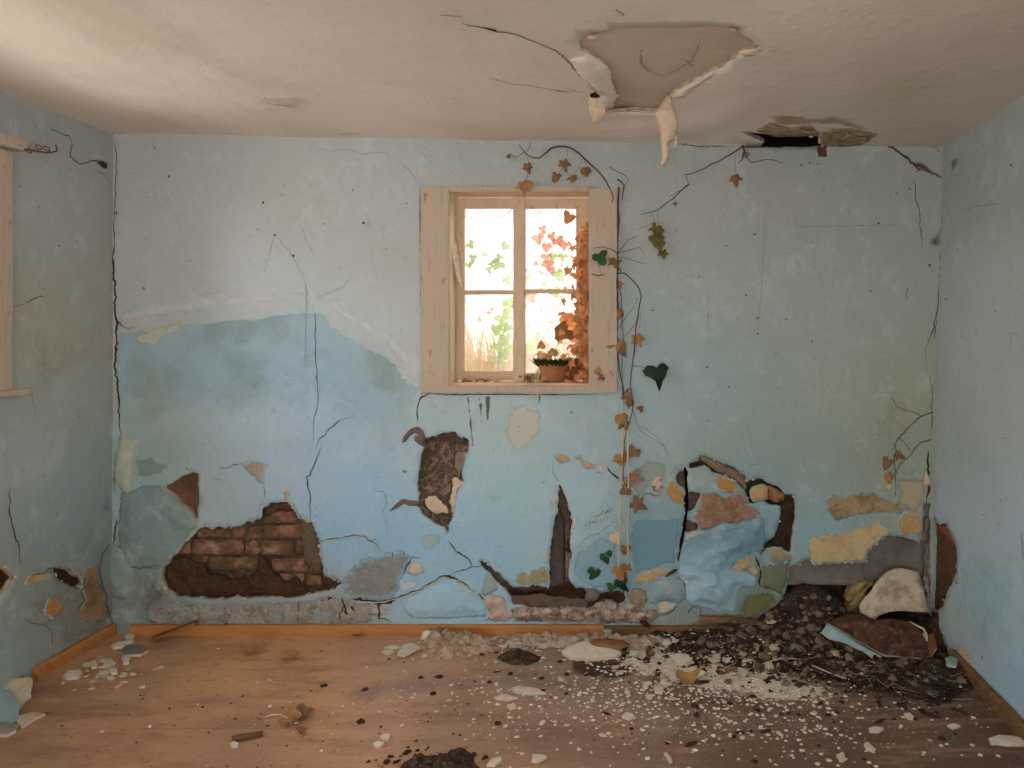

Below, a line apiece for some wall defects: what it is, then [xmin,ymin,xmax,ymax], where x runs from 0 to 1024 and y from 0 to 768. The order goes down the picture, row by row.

crack [441,15,589,93]
spalling [757,122,876,147]
crack [51,128,131,494]
peeling [0,561,108,623]
flaking render [146,460,426,624]
crack [266,235,490,623]
flaking render [390,426,469,533]
flaking render [420,484,757,700]
flaking render [650,455,961,617]